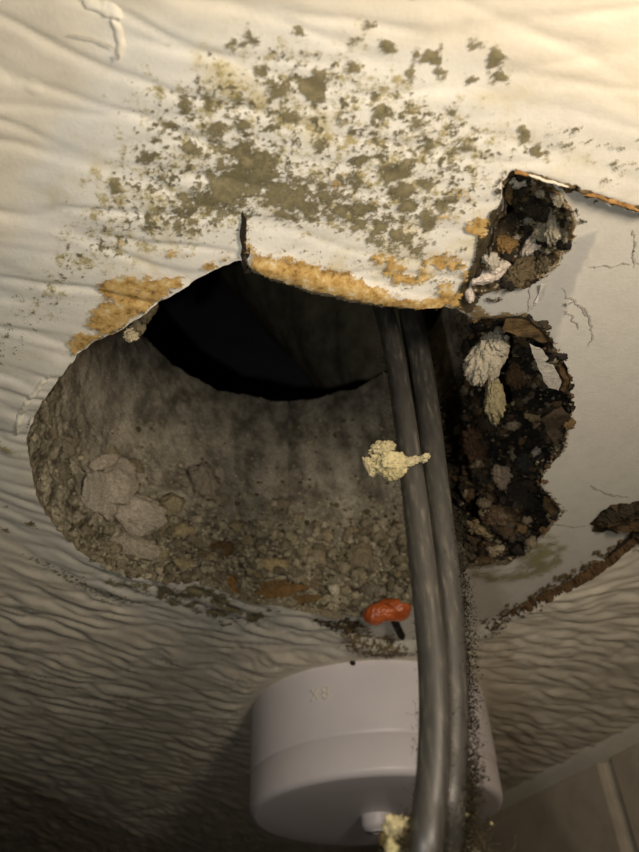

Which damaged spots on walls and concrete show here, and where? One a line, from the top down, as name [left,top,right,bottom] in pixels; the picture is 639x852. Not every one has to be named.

peeling [62,274,191,355]
water stain [0,20,583,365]
spalling [202,171,587,569]
spalling [590,501,639,544]